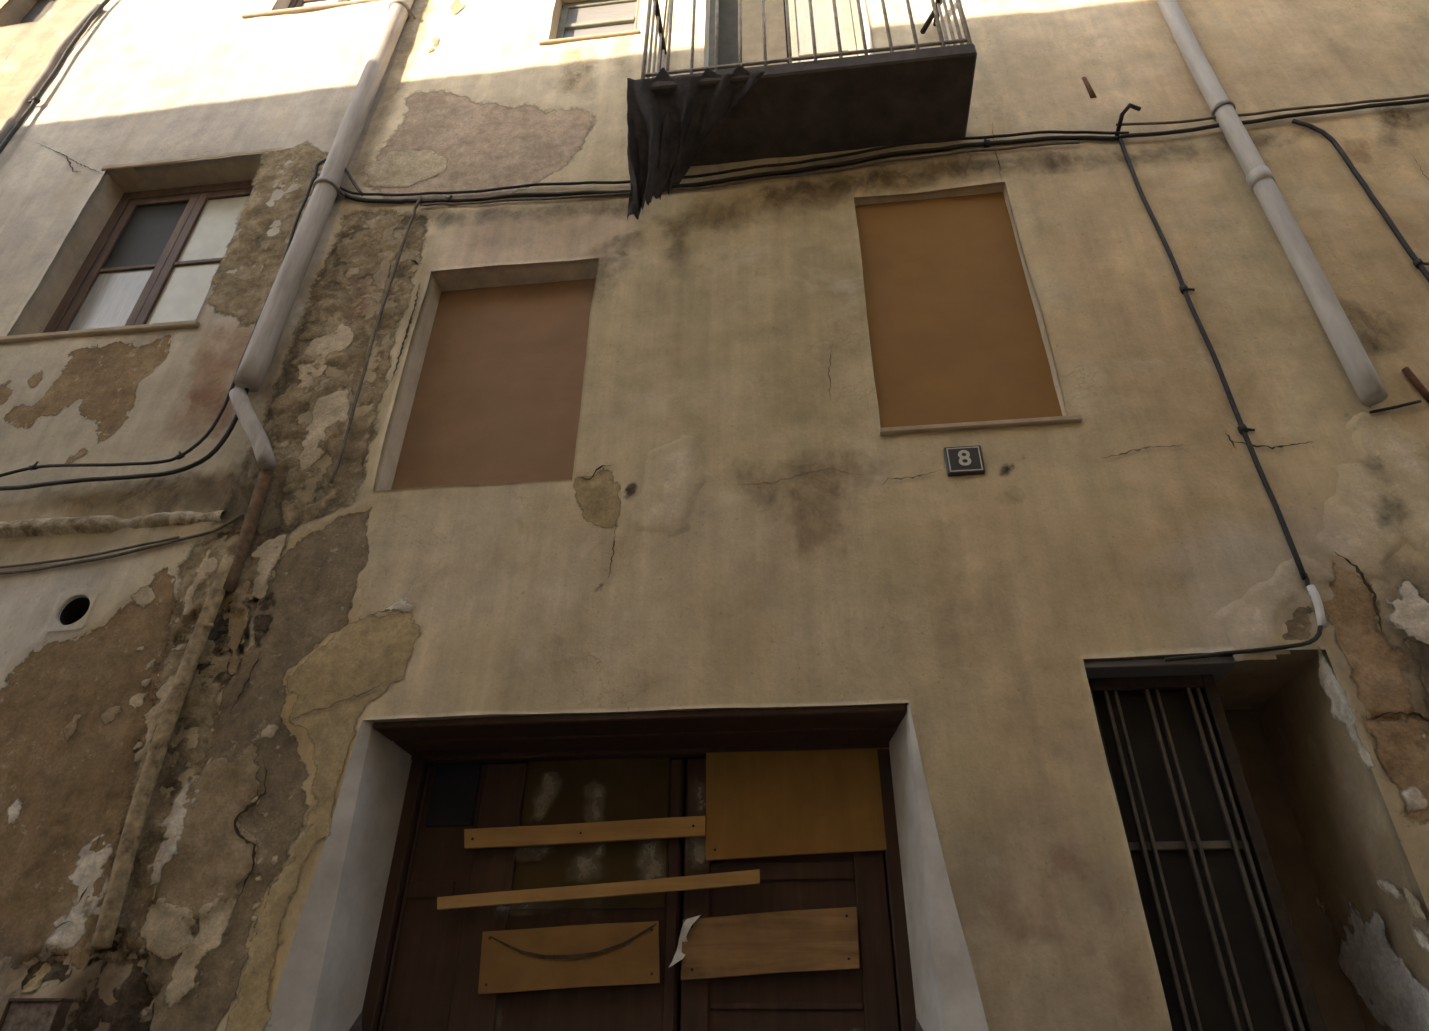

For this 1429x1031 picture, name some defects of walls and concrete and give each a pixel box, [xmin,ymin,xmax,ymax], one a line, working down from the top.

peeling [451,0,465,14]
crack [36,142,106,176]
crack [1001,465,1014,475]
crack [1106,444,1186,458]
crack [1225,432,1308,450]
peeling [0,90,595,1031]
peeling [573,465,636,586]
peeling [1213,552,1429,823]
peeling [1377,879,1429,952]
peeling [1337,901,1429,1031]